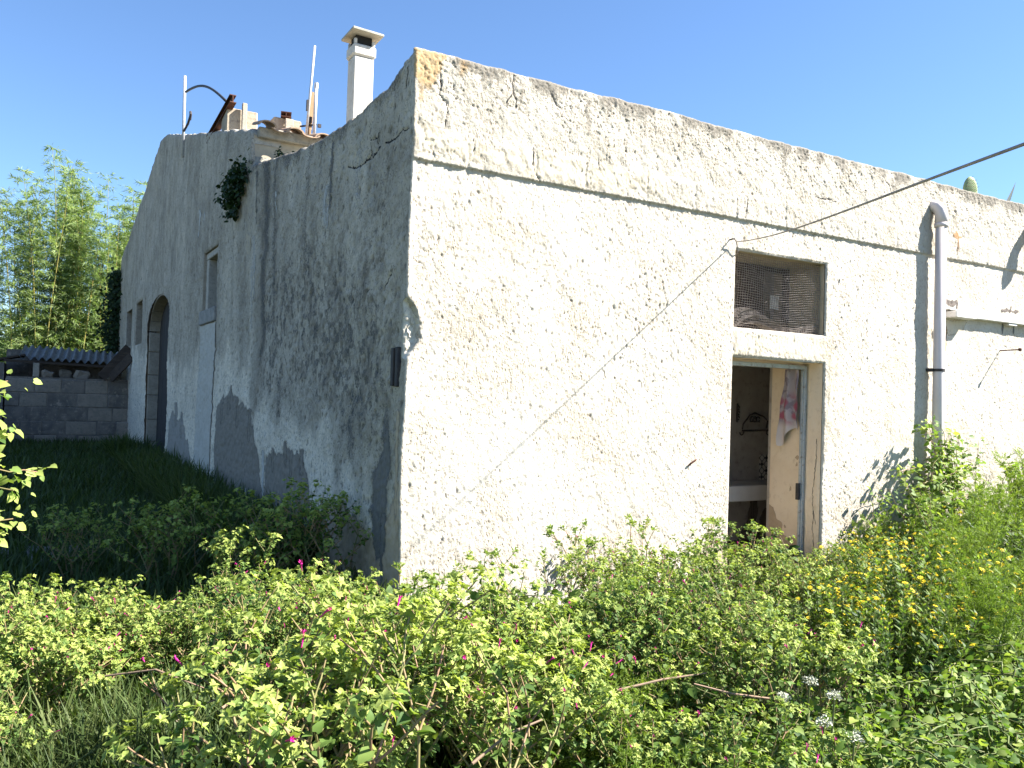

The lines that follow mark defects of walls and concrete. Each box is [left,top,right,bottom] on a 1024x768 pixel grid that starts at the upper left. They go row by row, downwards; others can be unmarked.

crack [507,76,518,109]
crack [348,128,409,169]
water stain [214,120,400,604]
water stain [167,402,191,467]